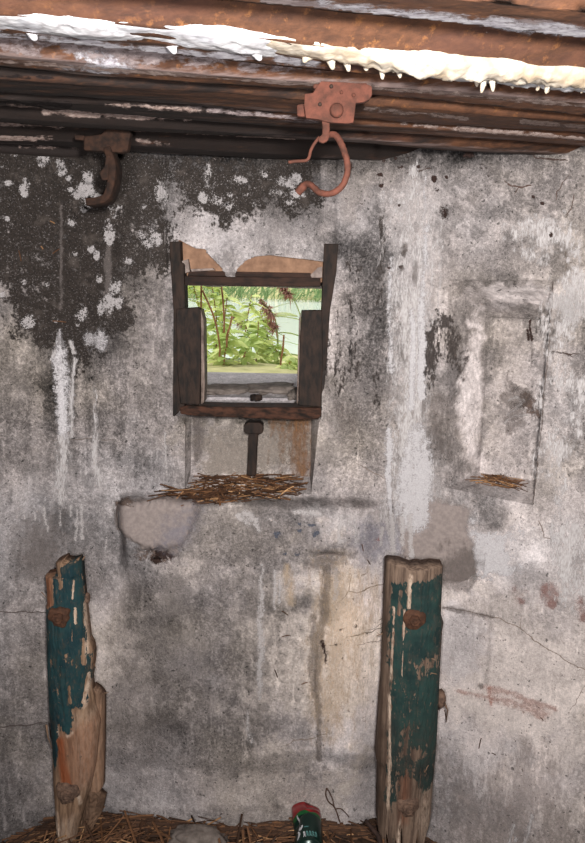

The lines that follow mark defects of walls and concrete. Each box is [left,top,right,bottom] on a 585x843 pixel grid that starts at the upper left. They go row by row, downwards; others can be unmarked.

water stain [0,100,319,123]
water stain [0,14,585,107]
water stain [364,107,585,141]
water stain [0,122,326,541]
water stain [324,162,470,557]
water stain [256,563,281,697]
crack [445,607,585,710]